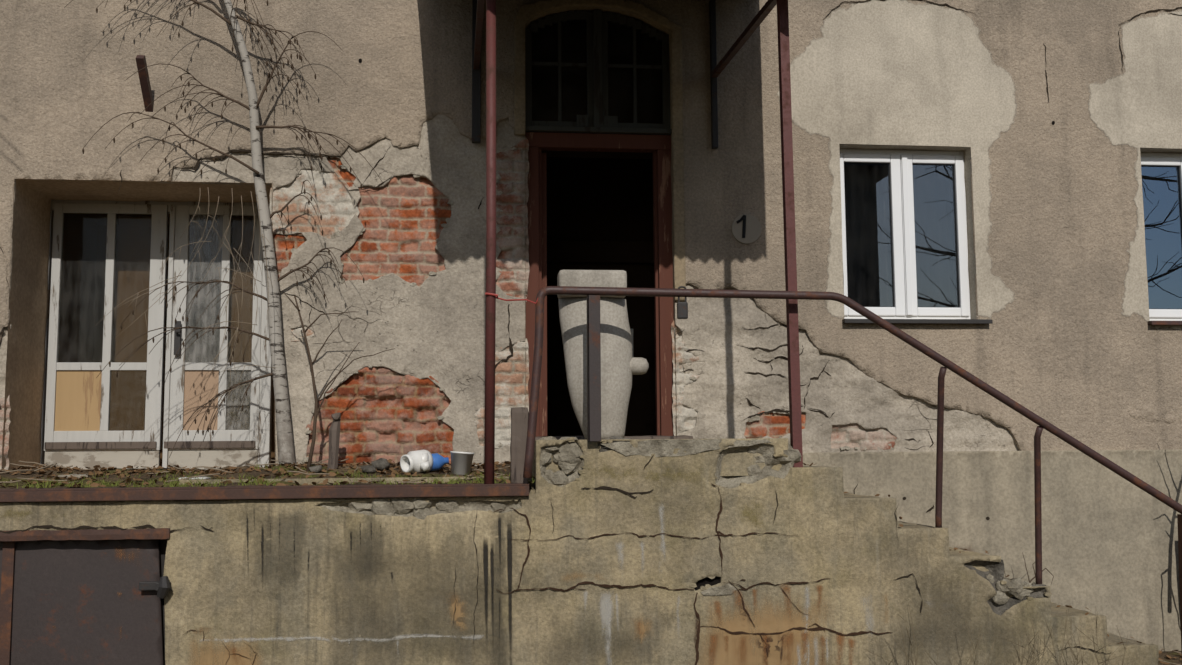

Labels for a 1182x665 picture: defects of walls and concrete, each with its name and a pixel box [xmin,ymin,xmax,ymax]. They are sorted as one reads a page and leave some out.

flaking render [159,114,530,466]
spalling [0,324,12,470]
crack [738,322,835,420]
flaking render [597,283,1019,489]
crack [581,456,653,498]
leakage [246,518,280,571]
leakage [215,634,440,645]
leakage [462,518,512,649]
crack [453,483,893,665]
rust [709,587,853,665]
crack [894,503,923,610]
spalling [962,560,1052,616]